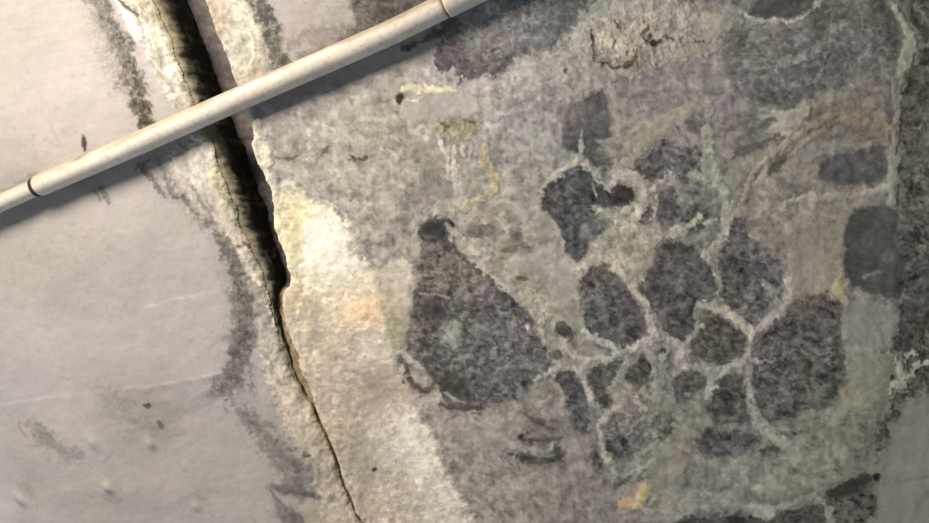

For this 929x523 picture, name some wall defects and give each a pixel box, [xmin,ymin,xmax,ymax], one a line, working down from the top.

water stain [78,0,158,130]
crack [153,0,238,105]
spalling [247,105,274,185]
water stain [253,108,311,165]
water stain [239,0,427,72]
peeling [394,81,502,127]
spalling [580,0,708,84]
water stain [272,0,929,523]
water stain [91,149,327,523]
spalling [166,132,358,523]
crack [204,109,363,523]